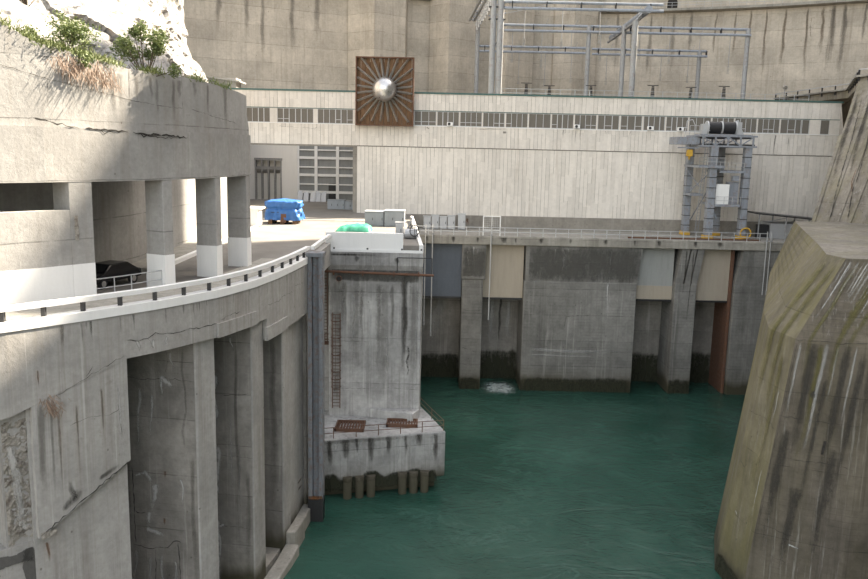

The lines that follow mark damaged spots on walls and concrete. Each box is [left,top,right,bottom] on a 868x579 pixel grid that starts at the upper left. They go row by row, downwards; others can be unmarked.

crack [34,118,185,139]
crack [131,312,239,381]
damp [332,253,419,370]
damp [813,265,867,336]
damp [797,347,868,470]
spalling [0,418,33,547]
damp [769,432,788,506]
damp [782,491,799,548]